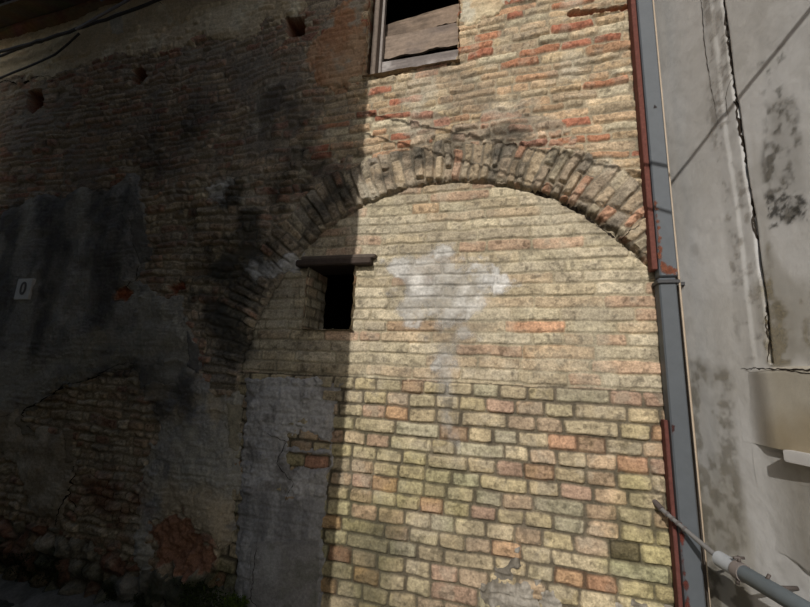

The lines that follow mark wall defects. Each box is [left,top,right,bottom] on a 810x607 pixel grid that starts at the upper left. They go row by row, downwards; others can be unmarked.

water stain [197,178,300,298]
water stain [387,245,510,328]
crack [701,0,810,374]
peeling [133,371,244,581]